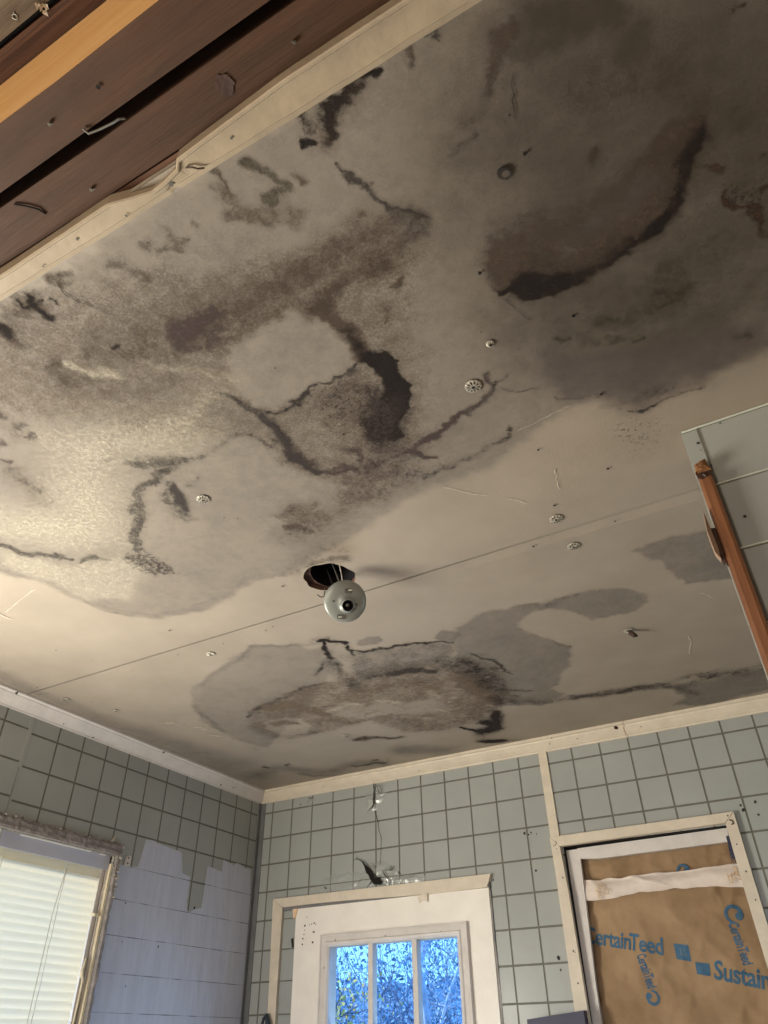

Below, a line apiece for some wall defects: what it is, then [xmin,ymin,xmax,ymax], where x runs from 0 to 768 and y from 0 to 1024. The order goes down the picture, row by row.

water stain [299,68,383,150]
water stain [486,113,709,301]
water stain [0,158,497,501]
water stain [0,544,111,564]
water stain [124,455,203,577]
water stain [246,632,534,743]
water stain [551,674,717,703]